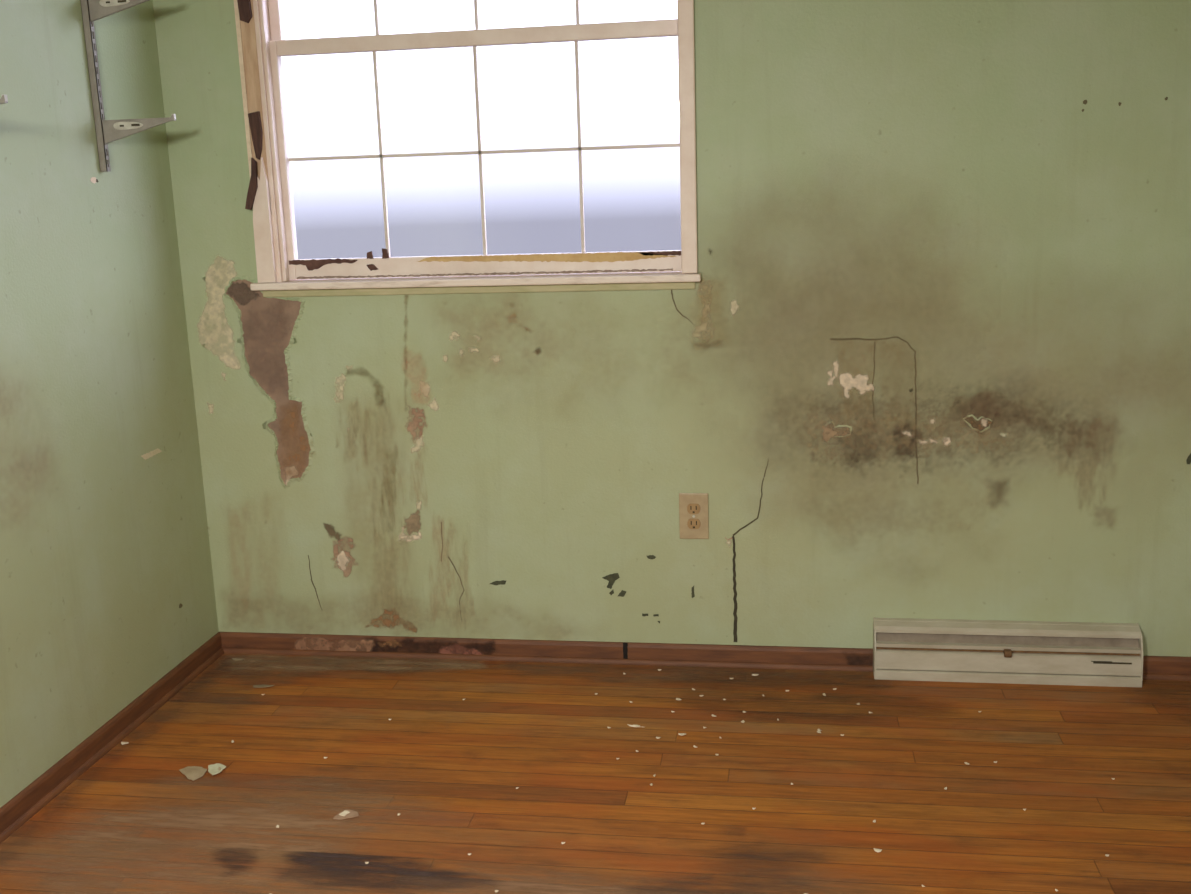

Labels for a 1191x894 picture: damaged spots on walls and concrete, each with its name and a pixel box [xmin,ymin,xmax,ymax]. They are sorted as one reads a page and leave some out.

peeling [197,256,315,489]
flaking render [828,361,874,398]
peeling [407,381,438,453]
peeling [324,523,355,577]
crack [725,458,769,642]